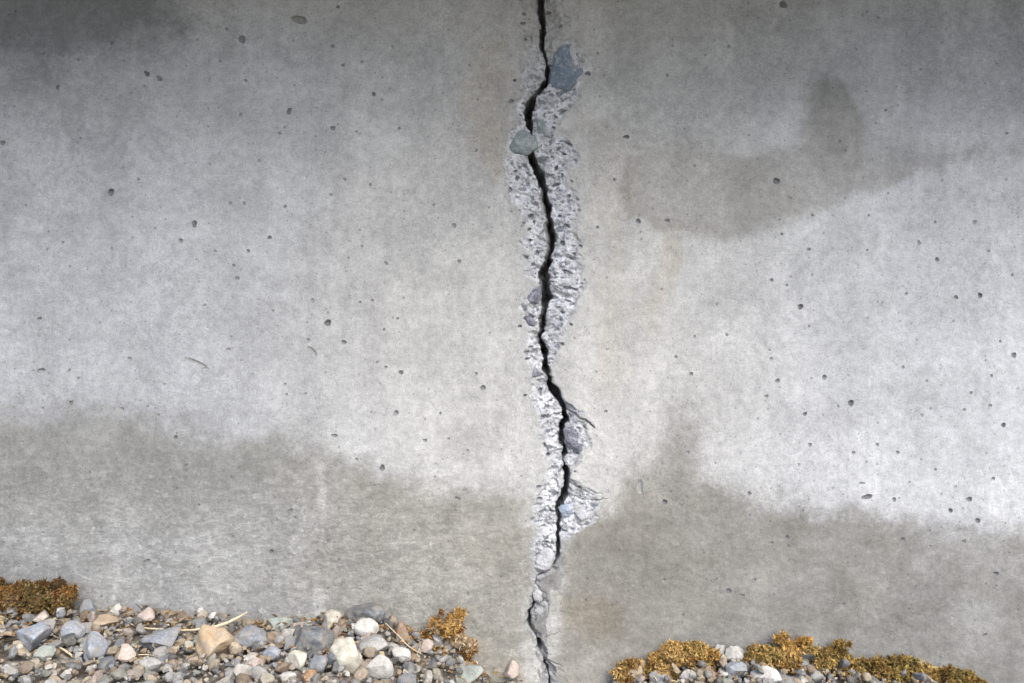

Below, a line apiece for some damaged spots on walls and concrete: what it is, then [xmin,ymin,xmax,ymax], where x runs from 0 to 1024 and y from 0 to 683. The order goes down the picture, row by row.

water stain [0,382,1024,683]
spalling [501,0,601,683]
crack [523,0,608,683]
water stain [568,0,1024,250]